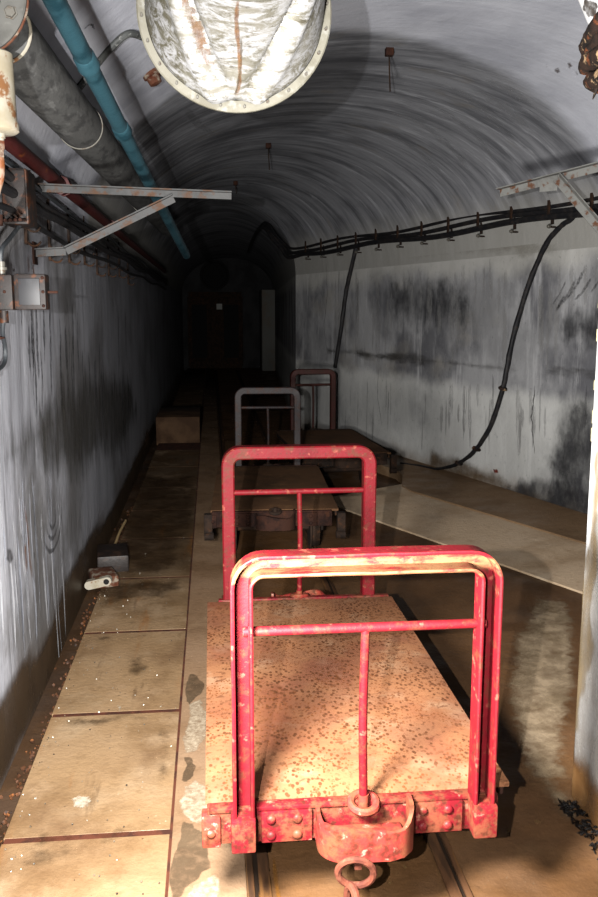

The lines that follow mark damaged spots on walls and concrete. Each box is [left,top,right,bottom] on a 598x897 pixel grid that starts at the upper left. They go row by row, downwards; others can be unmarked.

leakage [566,312,598,342]
leakage [21,311,137,468]
leakage [0,424,190,781]
spalling [183,701,206,752]
spalling [180,781,207,822]
spalling [188,876,219,897]